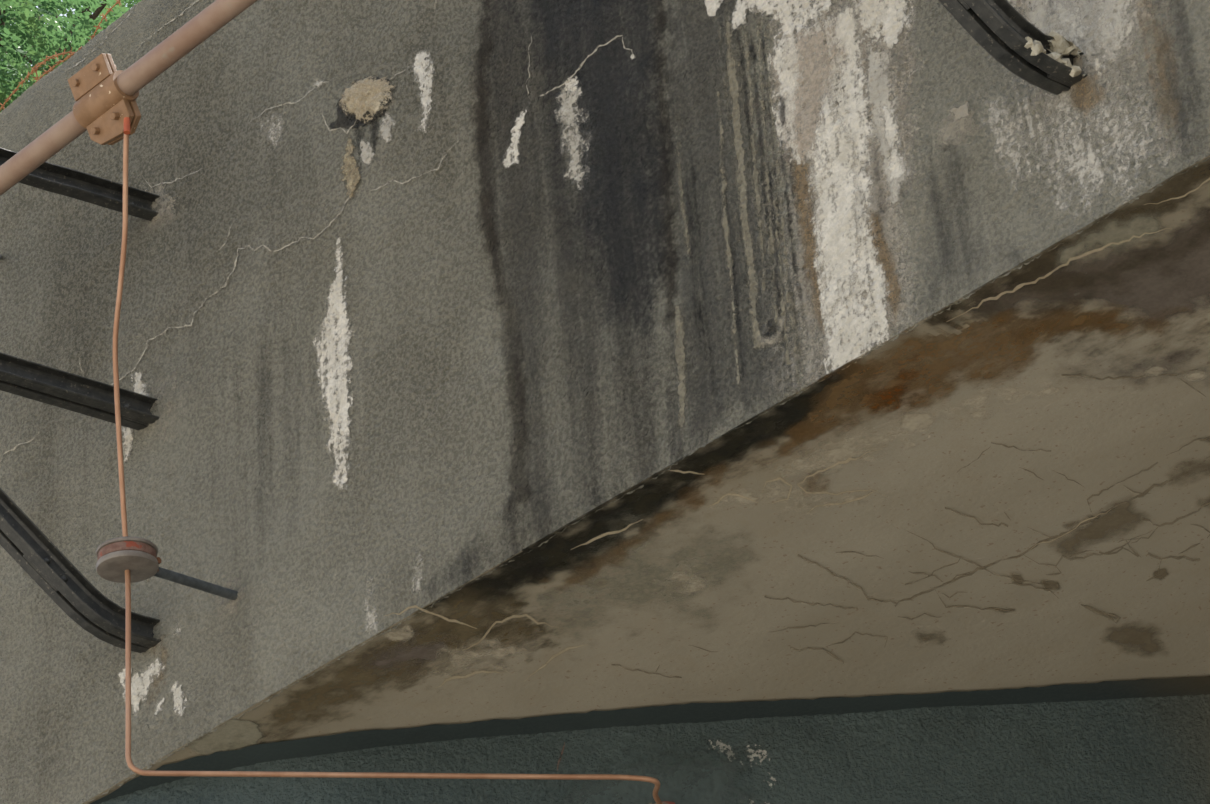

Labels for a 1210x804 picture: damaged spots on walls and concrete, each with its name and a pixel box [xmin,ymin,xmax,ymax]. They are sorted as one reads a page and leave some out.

efflorescence [414,52,434,133]
crack [503,35,635,187]
water stain [479,0,690,391]
water stain [704,0,913,384]
water stain [927,0,1210,326]
efflorescence [312,237,353,488]
water stain [674,306,686,428]
crack [1061,369,1206,397]
crack [764,436,1210,663]
water stain [1058,462,1210,555]
water stain [260,593,585,743]
water stain [1081,604,1161,654]